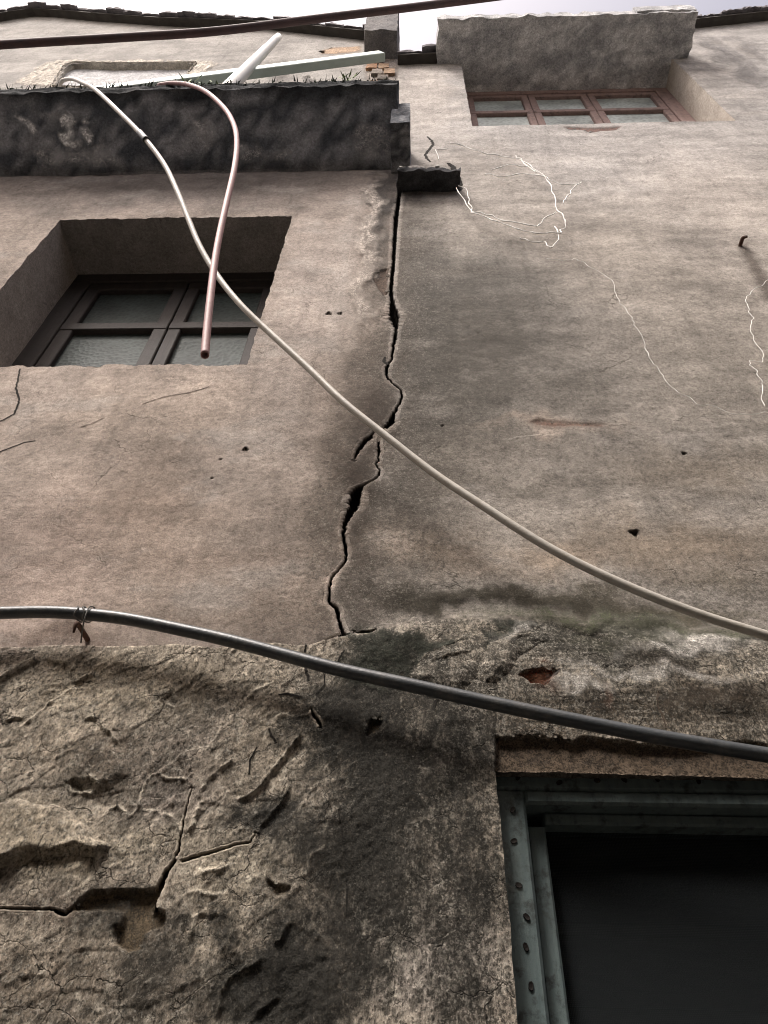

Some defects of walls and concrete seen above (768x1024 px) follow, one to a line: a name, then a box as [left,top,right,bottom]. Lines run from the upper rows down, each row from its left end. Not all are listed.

crack [424,136,463,190]
crack [278,189,408,729]
leakage [350,627,460,677]
flaking render [524,666,559,685]
leakage [657,620,753,705]
crack [248,728,277,774]
crack [151,788,258,914]
leakage [212,677,433,1024]
crack [0,903,78,919]